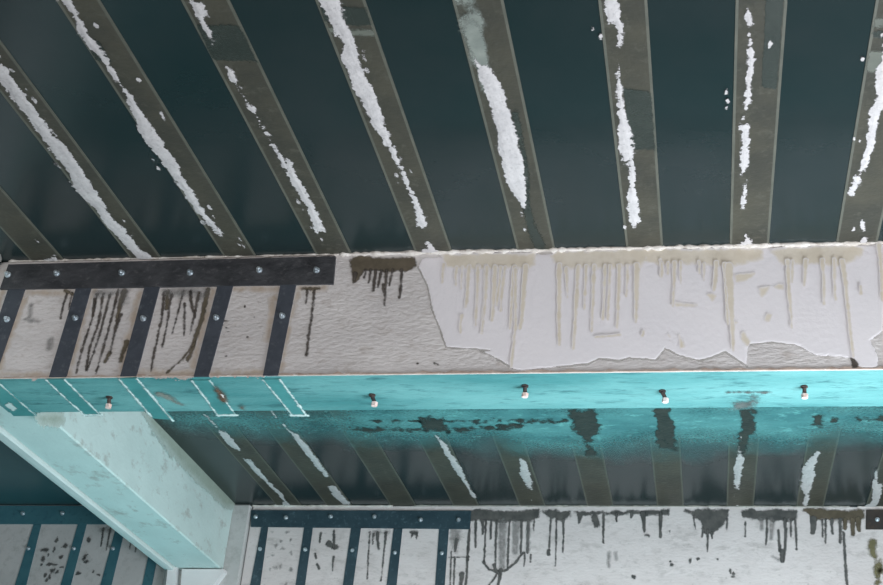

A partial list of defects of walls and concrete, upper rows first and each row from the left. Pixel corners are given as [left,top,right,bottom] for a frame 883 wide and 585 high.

leakage [455,0,490,89]
peeling [318,0,427,228]
peeling [738,8,757,209]
peeling [847,33,883,197]
leakage [439,112,883,368]
leakage [75,289,129,374]
leakage [151,288,210,374]
leakage [302,287,320,356]
peeling [278,219,883,376]
leakage [449,509,669,585]
leakage [684,508,729,552]
leakage [742,508,865,585]